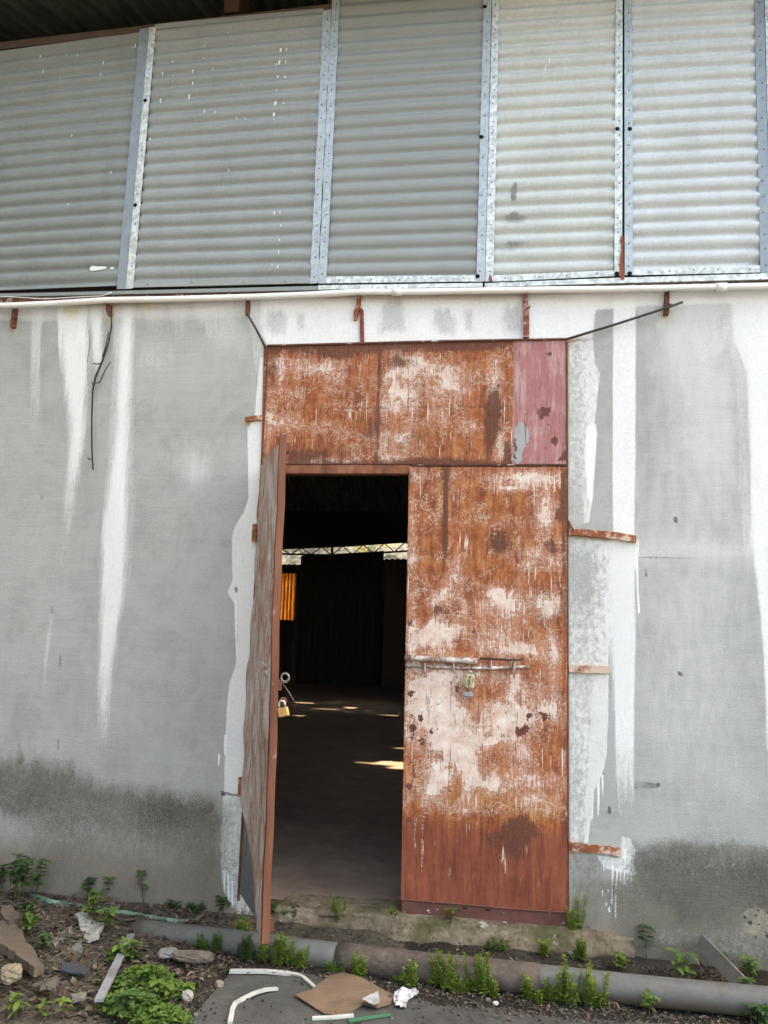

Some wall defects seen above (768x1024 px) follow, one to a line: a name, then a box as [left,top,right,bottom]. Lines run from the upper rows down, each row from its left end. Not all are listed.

leakage [57,300,265,747]
leakage [0,745,235,913]
leakage [569,833,768,971]